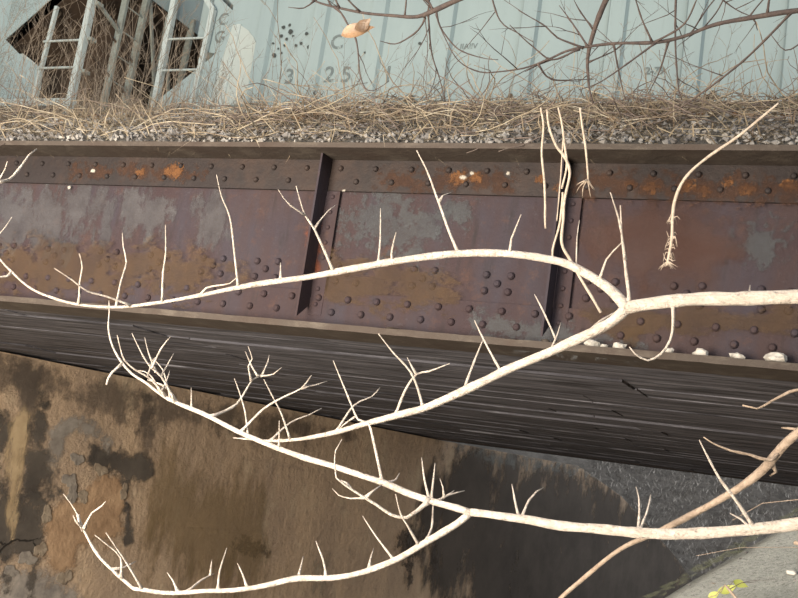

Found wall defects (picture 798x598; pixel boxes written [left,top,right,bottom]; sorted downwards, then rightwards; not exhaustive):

corrosion [164,163,184,181]
corrosion [450,170,481,186]
corrosion [589,207,738,288]
leakage [212,406,243,429]
leakage [258,415,310,438]
leakage [0,354,69,598]
leakage [87,379,201,546]
leakage [395,444,692,598]
leakage [313,560,327,591]